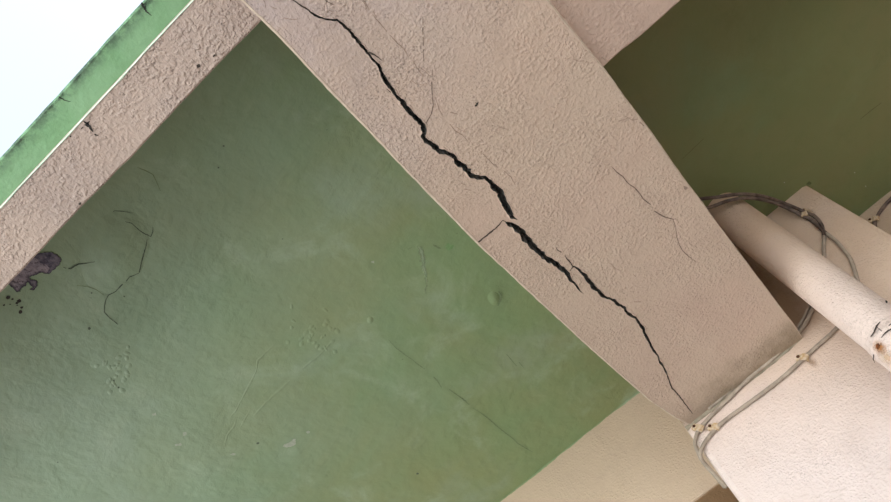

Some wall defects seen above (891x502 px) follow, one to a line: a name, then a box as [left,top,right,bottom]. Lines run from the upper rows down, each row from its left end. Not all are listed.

crack [264,0,696,414]
spalling [3,252,62,314]
crack [63,210,153,324]